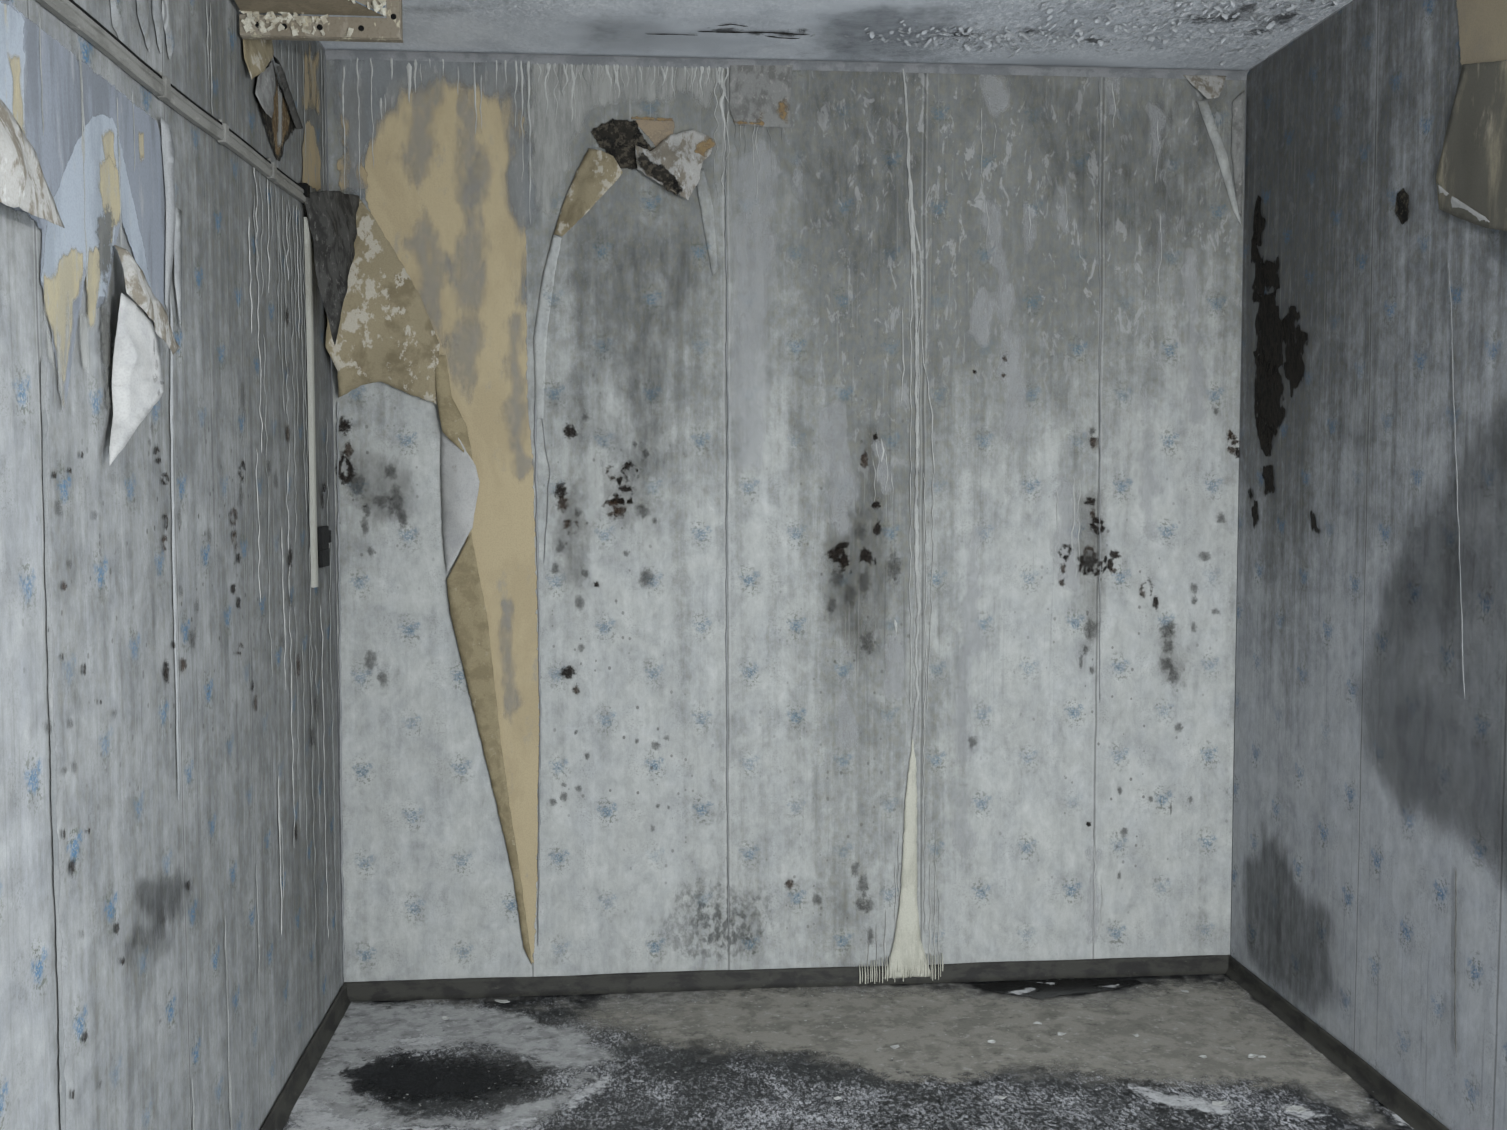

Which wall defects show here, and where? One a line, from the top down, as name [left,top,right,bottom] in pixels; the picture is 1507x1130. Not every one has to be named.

peeling [1457,0,1507,65]
spalling [591,118,675,170]
peeling [0,0,182,411]
damp [1248,195,1308,528]
peeling [255,59,540,963]
damp [555,483,579,533]
damp [564,416,586,438]
damp [603,444,656,522]
damp [828,69,944,984]
damp [1055,476,1120,586]
damp [1227,430,1240,458]
damp [561,665,580,694]